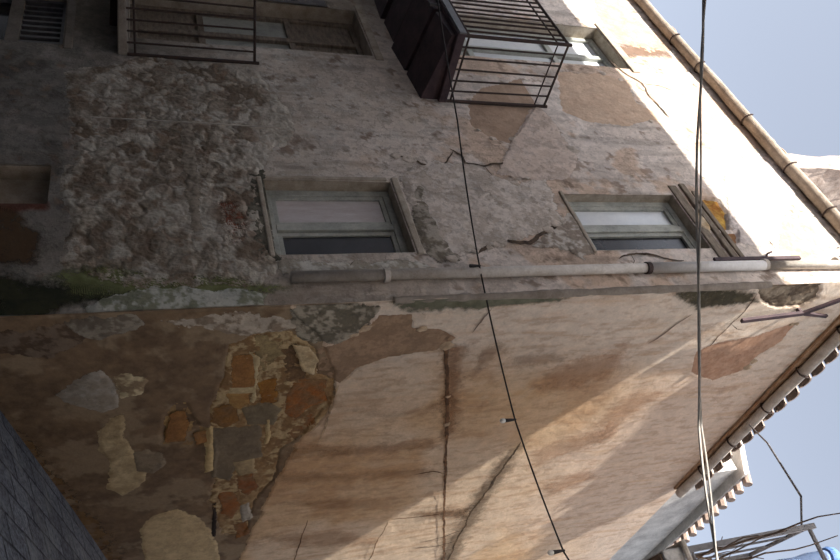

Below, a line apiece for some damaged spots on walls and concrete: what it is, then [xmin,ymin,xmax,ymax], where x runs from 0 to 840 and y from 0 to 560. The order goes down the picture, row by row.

crack [608,59,675,118]
crack [390,149,503,175]
peeling [400,79,580,263]
peeling [557,71,829,260]
crack [478,220,562,254]
leakage [85,286,268,313]
crack [710,296,756,346]
peeling [691,323,800,380]
flaking render [0,305,455,560]
crack [369,347,521,560]